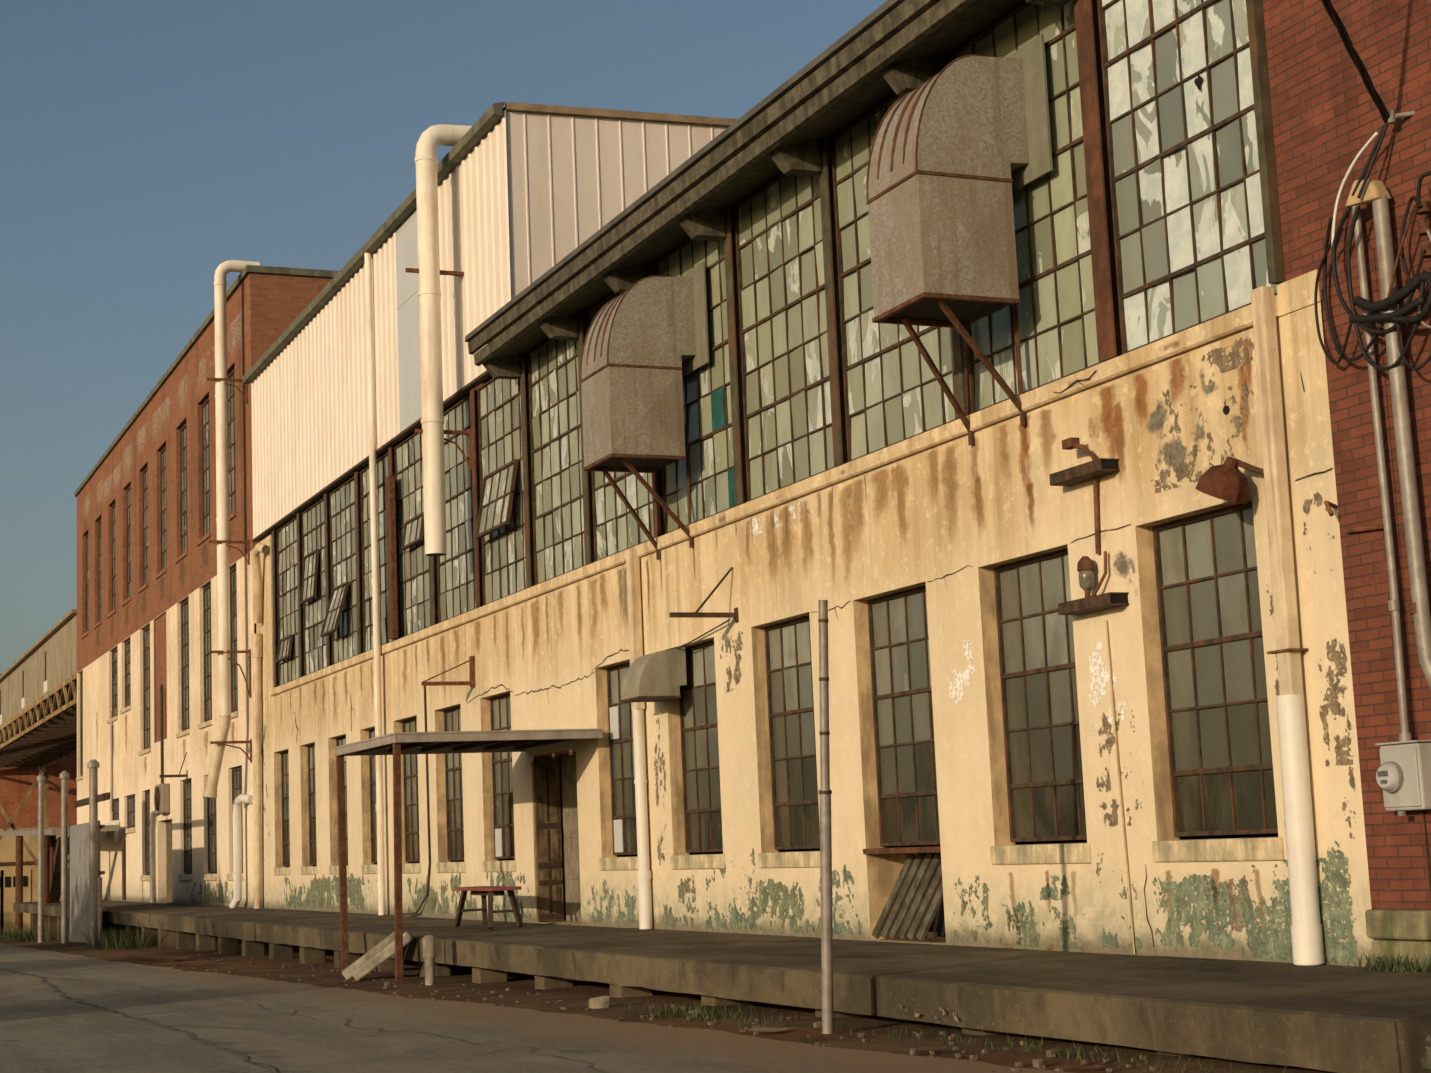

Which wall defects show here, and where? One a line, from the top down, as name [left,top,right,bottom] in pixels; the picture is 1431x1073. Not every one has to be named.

peeling [1145,337,1256,493]
corrosion [971,440,983,520]
crack [468,649,629,704]
peeling [719,631,743,692]
peeling [1316,638,1359,963]